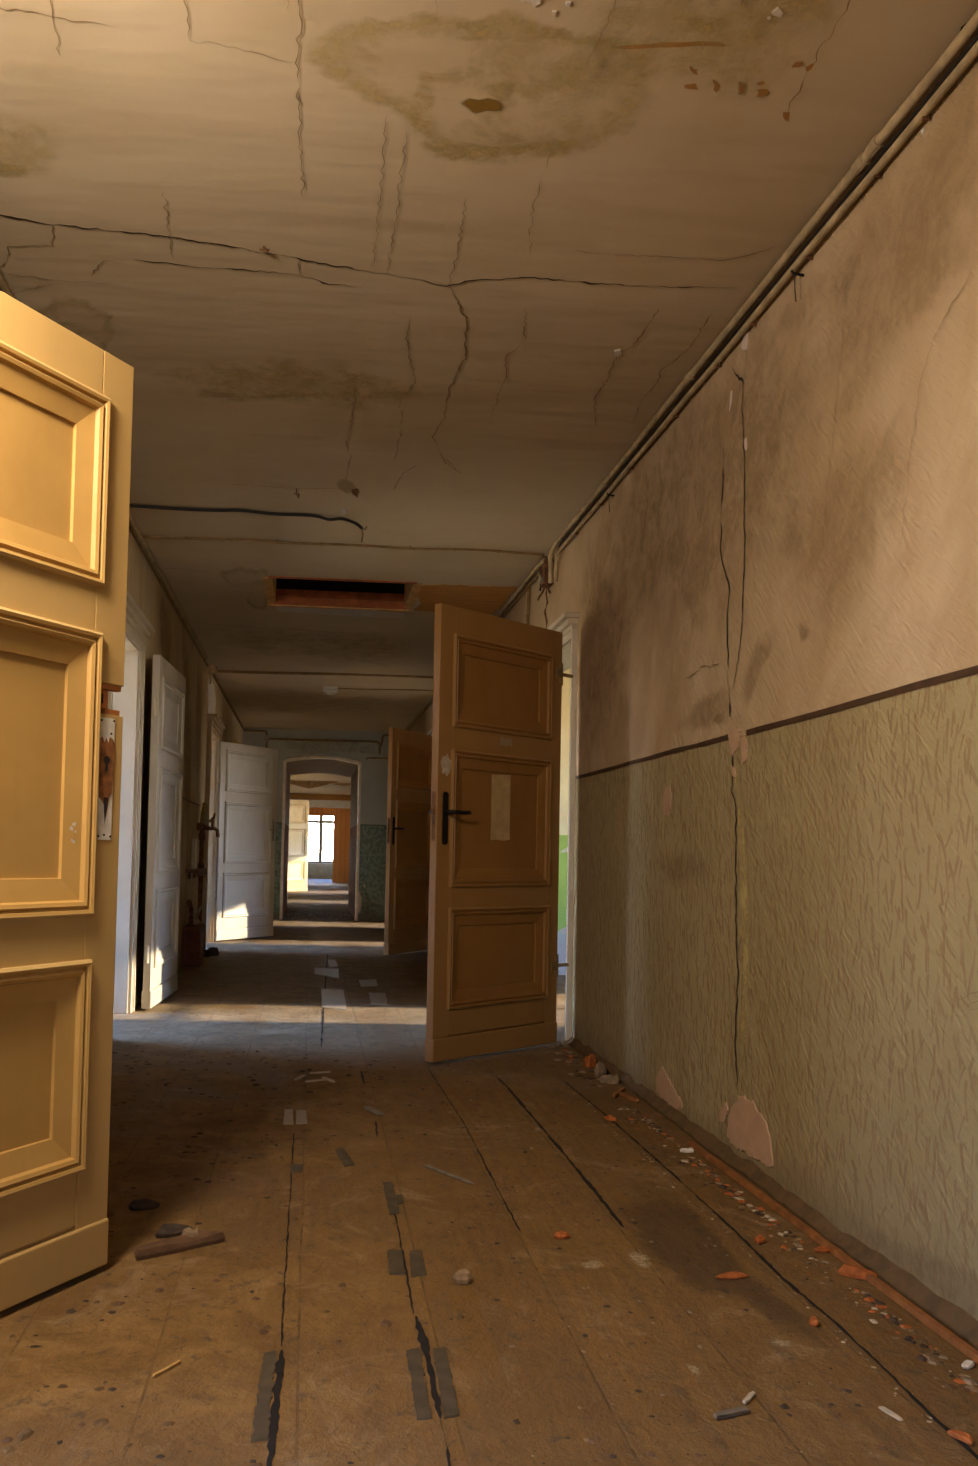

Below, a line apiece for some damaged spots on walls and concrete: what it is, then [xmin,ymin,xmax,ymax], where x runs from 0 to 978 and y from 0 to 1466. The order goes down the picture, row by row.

crack [0,0,108,53]
crack [787,0,850,113]
crack [184,0,305,197]
water stain [462,98,503,113]
crack [0,116,773,492]
flaking render [656,1067,684,1110]
flaking render [719,1096,774,1168]